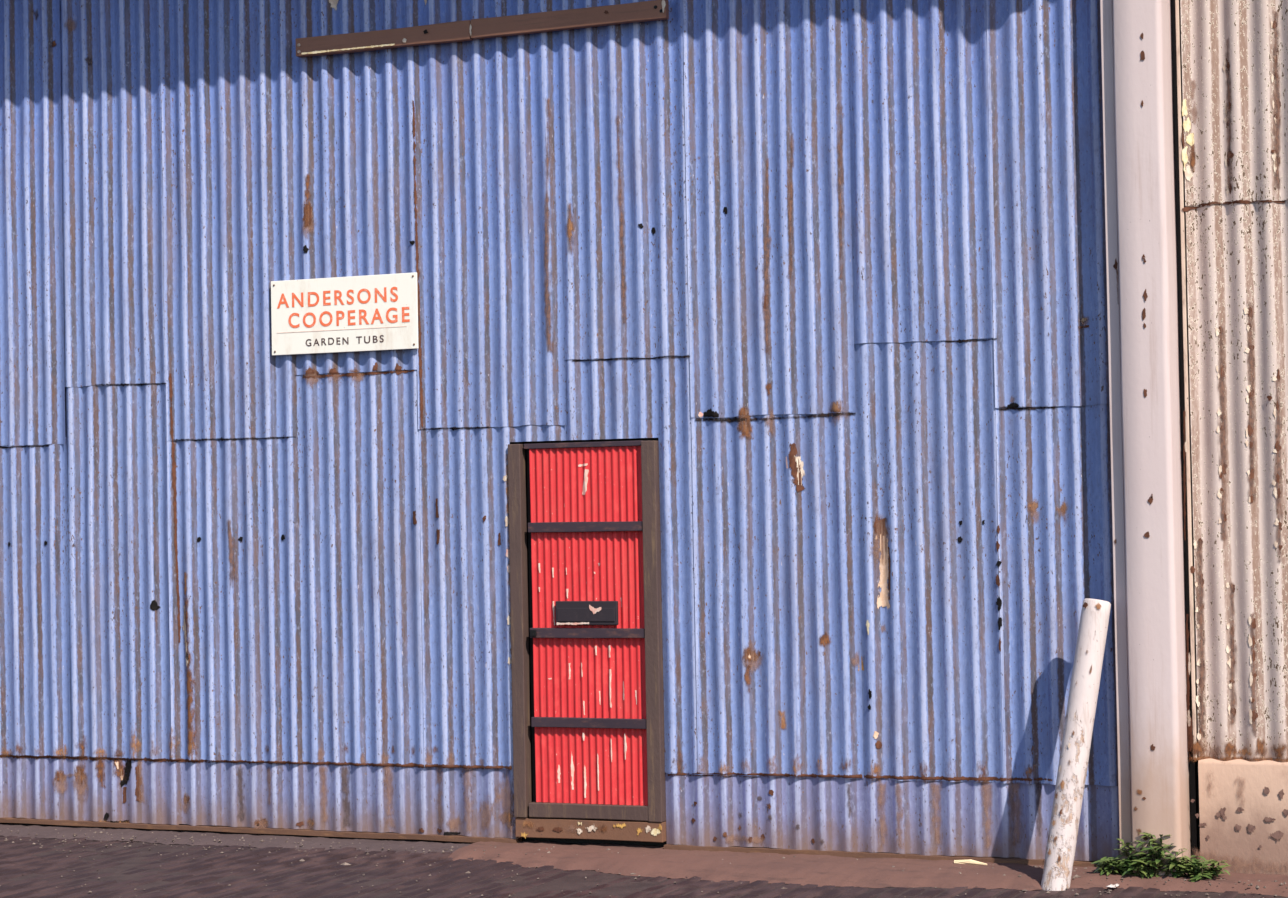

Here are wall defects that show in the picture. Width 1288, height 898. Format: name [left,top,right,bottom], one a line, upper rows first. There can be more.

rust [544,99,554,351]
rust [302,101,489,431]
rust [0,373,518,838]
peeling [583,645,637,715]
rust [743,643,761,692]
peeling [557,734,627,798]
spalling [1191,787,1288,848]